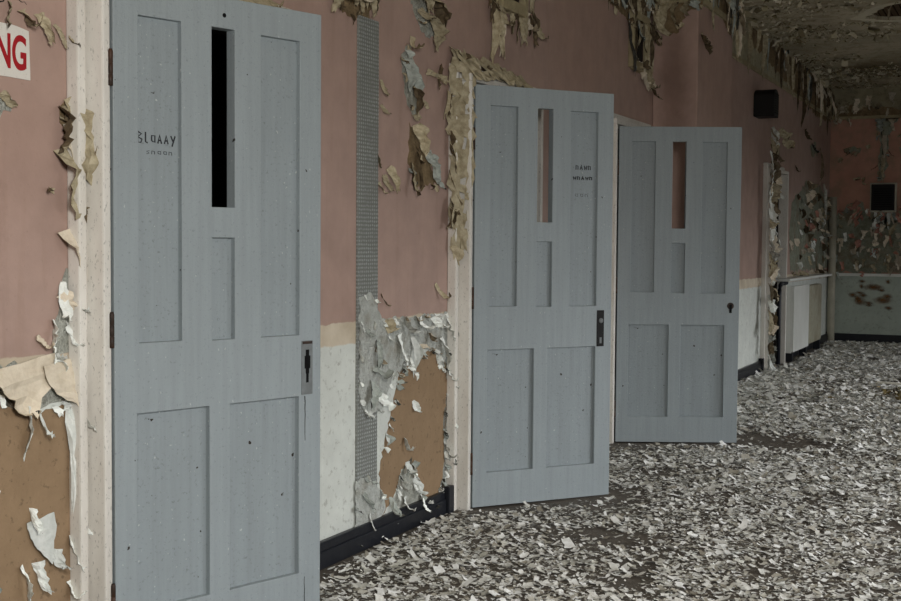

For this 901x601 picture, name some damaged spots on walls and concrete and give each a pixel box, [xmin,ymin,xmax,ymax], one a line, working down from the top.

peeling [0,90,18,117]
peeling [58,229,81,267]
peeling [53,96,99,223]
peeling [331,0,380,24]
peeling [401,0,549,266]
peeling [608,0,901,372]
peeling [0,268,91,601]
peeling [354,292,460,537]